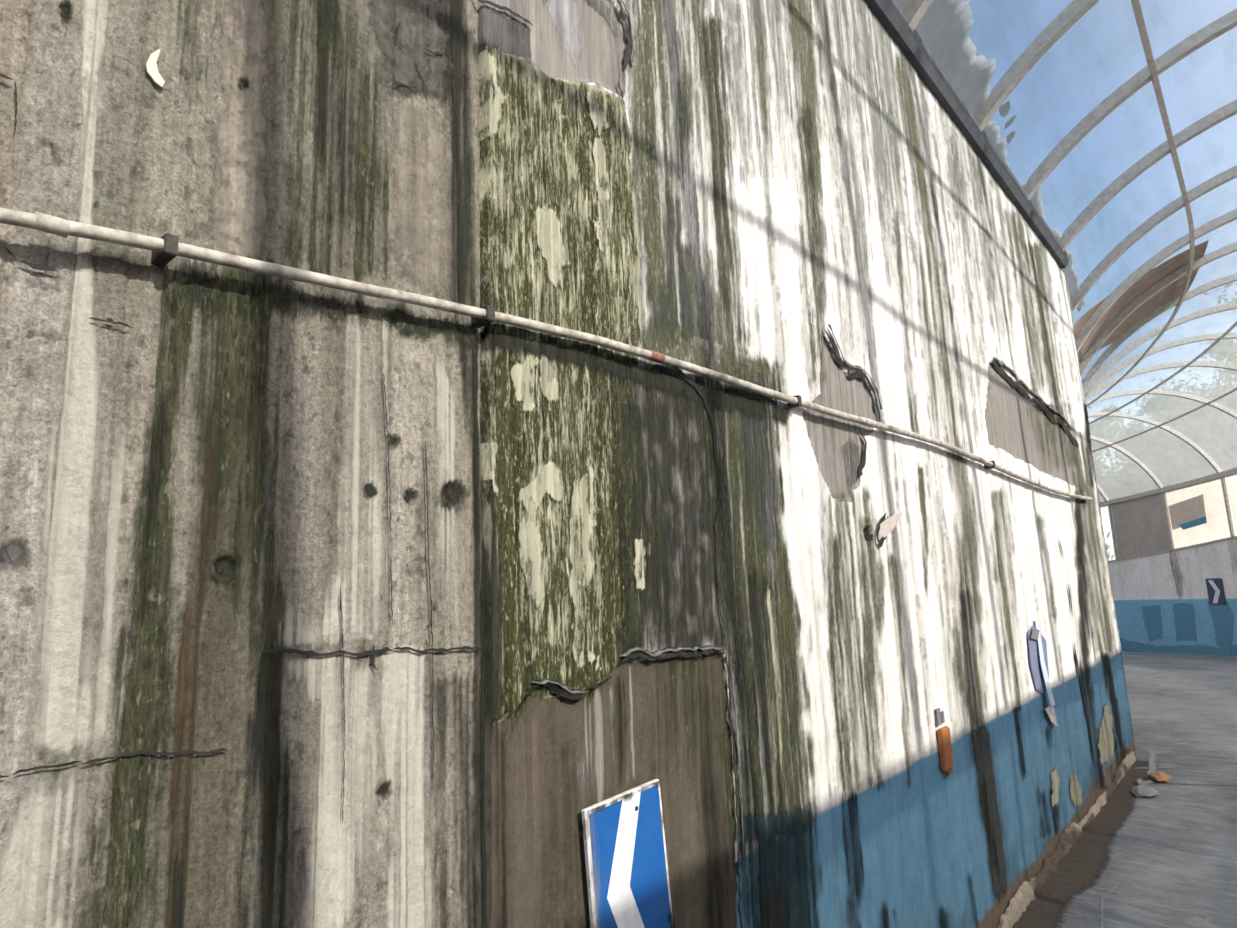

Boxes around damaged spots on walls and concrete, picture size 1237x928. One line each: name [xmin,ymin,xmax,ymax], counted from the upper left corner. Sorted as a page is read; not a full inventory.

crack [0,73,18,130]
damp [0,772,85,928]
damp [27,0,147,756]
crack [0,748,228,778]
damp [140,401,167,614]
peeling [0,0,737,928]
crack [262,374,483,822]
damp [174,0,1063,928]
peeling [803,333,876,502]
peeling [985,363,1085,490]
flaking render [997,703,1136,928]
damp [1012,403,1158,928]